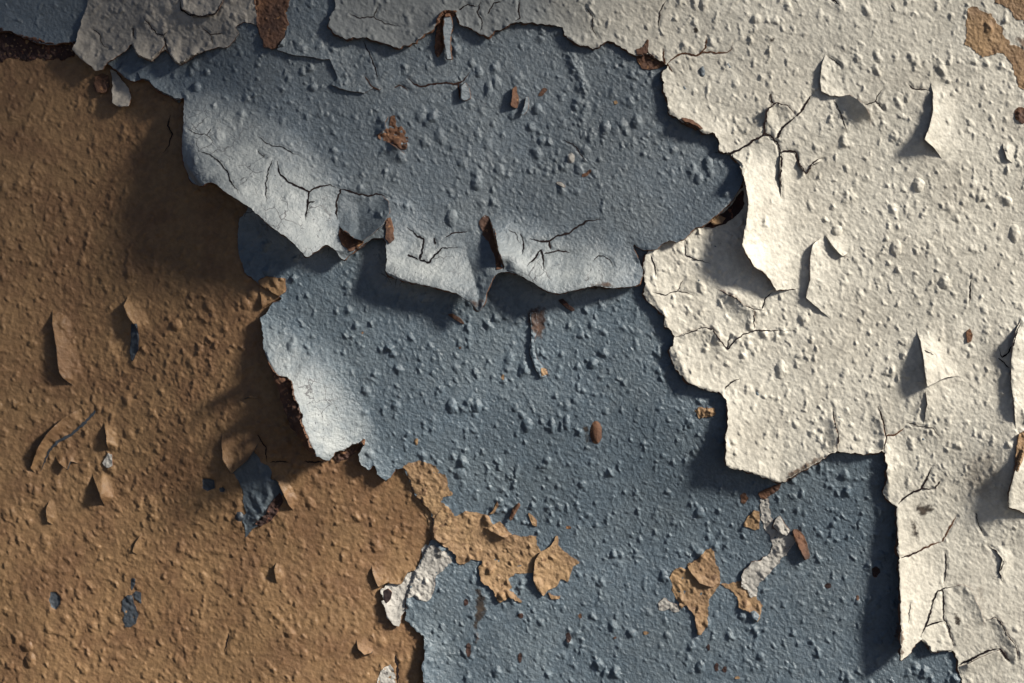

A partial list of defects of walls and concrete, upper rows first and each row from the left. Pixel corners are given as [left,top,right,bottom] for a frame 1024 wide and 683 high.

crack [258,137,386,220]
crack [716,94,846,194]
crack [407,227,467,264]
peeling [0,0,886,484]
crack [508,219,603,266]
crack [676,290,783,350]
peeling [916,313,973,424]
peeling [30,409,118,507]
peeling [252,276,579,683]
peeling [658,498,810,651]
peeling [884,492,1018,680]
crack [901,513,1018,666]